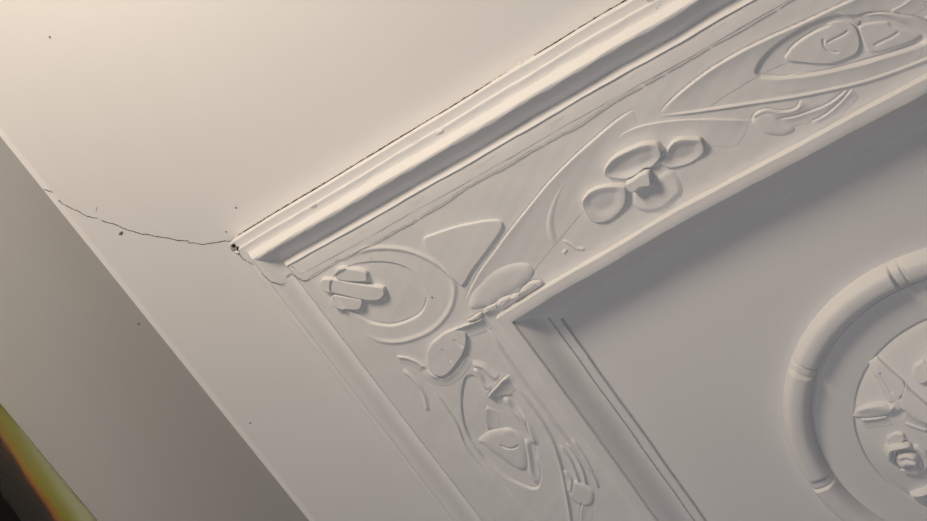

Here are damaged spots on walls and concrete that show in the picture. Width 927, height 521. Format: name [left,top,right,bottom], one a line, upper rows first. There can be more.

crack [43,0,787,284]